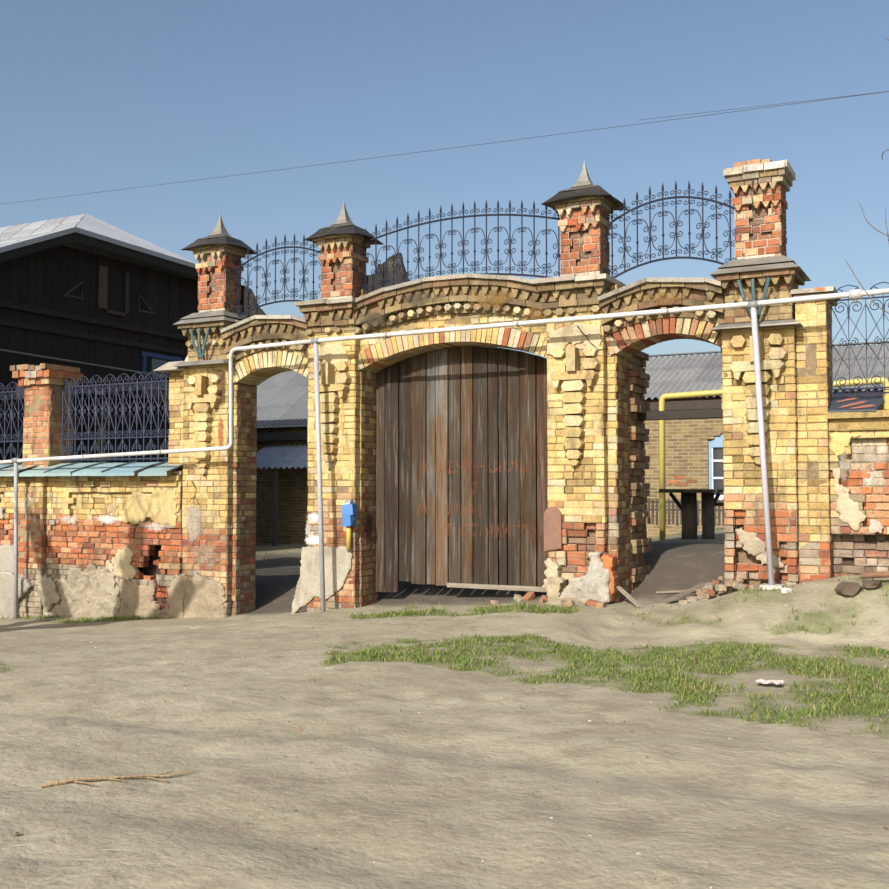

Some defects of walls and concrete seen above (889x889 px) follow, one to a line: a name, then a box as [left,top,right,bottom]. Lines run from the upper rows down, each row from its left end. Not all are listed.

spalling [829,431,889,535]
spalling [0,489,230,618]
flaking render [513,522,619,608]
spalling [678,510,809,605]